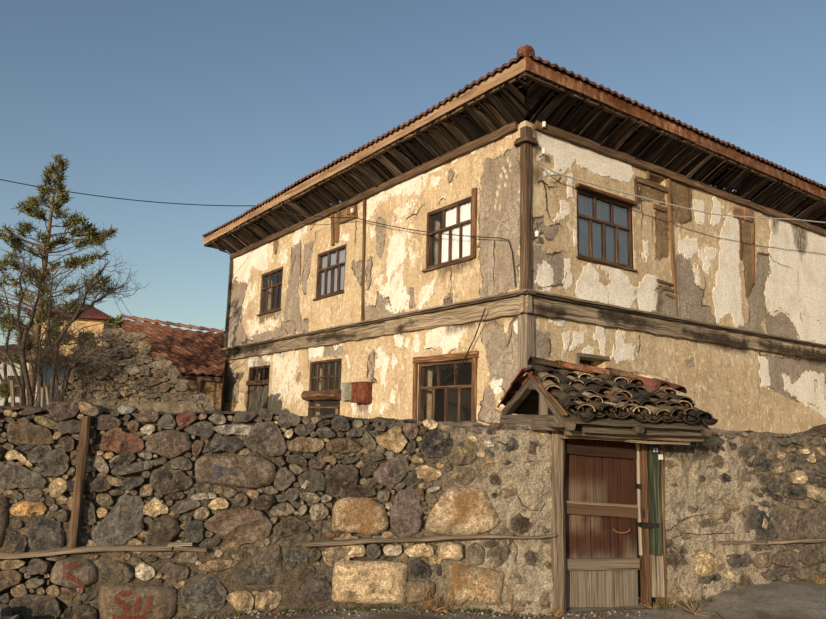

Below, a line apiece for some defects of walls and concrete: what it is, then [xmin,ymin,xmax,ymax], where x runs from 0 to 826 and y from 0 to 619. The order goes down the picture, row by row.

spalling [228,225,313,346]
peeling [351,156,461,320]
spalling [471,134,520,298]
peeling [532,130,826,345]
peeling [225,343,350,405]
peeling [351,325,466,416]
spalling [476,316,518,424]
spalling [758,352,826,419]